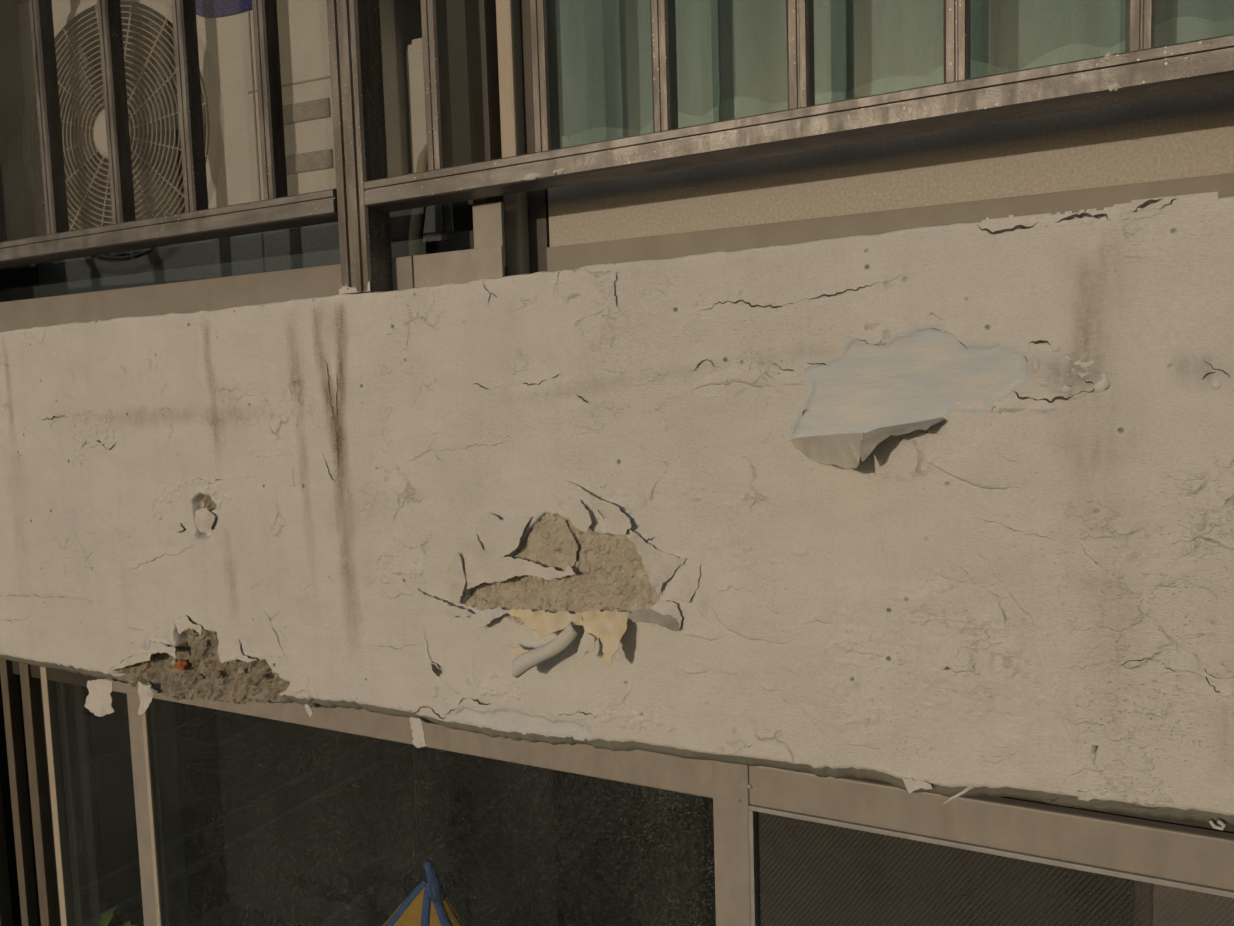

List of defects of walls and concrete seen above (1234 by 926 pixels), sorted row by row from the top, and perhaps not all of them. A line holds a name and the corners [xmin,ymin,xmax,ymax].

crack [704,275,900,310]
peeling [767,313,1111,470]
peeling [122,477,232,573]
spalling [373,480,701,748]
spalling [84,615,290,717]